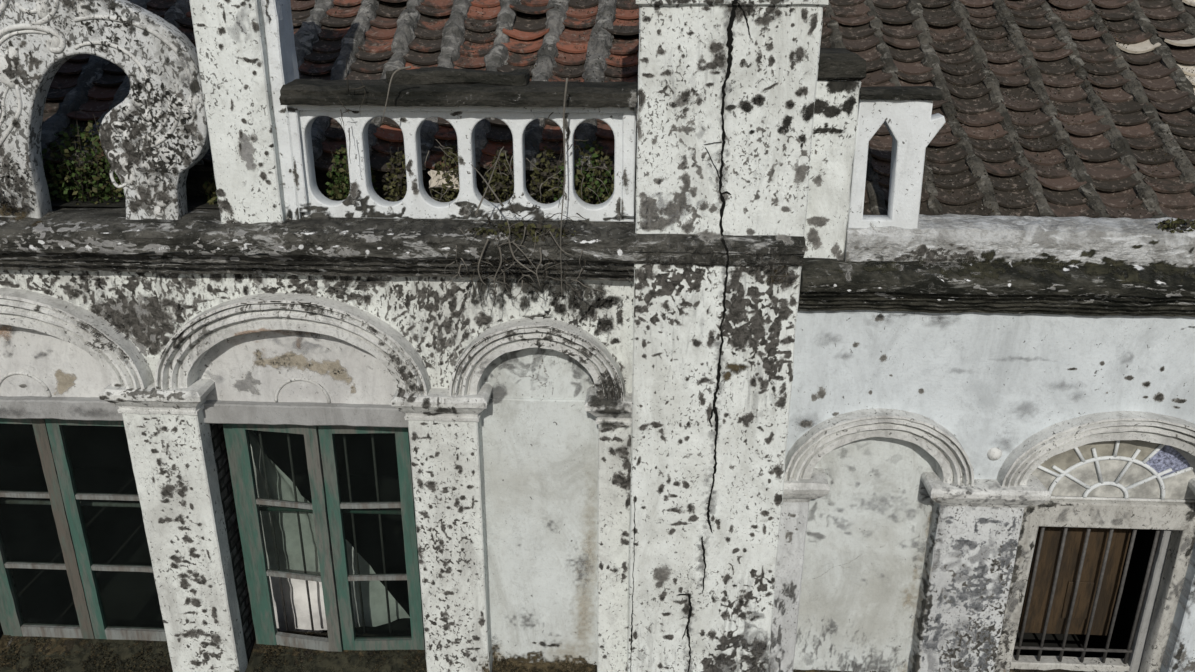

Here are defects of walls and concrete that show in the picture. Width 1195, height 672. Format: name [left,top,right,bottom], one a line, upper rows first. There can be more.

peeling [193,0,277,94]
peeling [629,0,860,249]
peeling [0,62,998,672]
crack [678,0,751,672]
peeling [1026,265,1195,305]
peeling [909,516,1019,672]